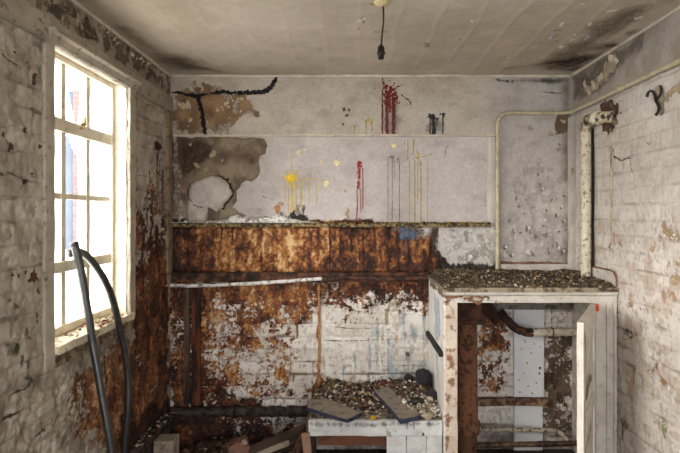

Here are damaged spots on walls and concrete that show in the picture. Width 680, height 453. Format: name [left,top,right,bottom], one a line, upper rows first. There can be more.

peeling [44,0,120,51]
peeling [115,47,163,87]
leakage [550,54,607,95]
peeling [582,52,619,96]
crack [170,77,277,134]
peeling [549,114,570,136]
flaking render [600,99,622,135]
flaking render [177,137,267,222]
corrosion [99,147,449,453]
corrosion [477,312,511,397]
corrosion [67,367,107,451]